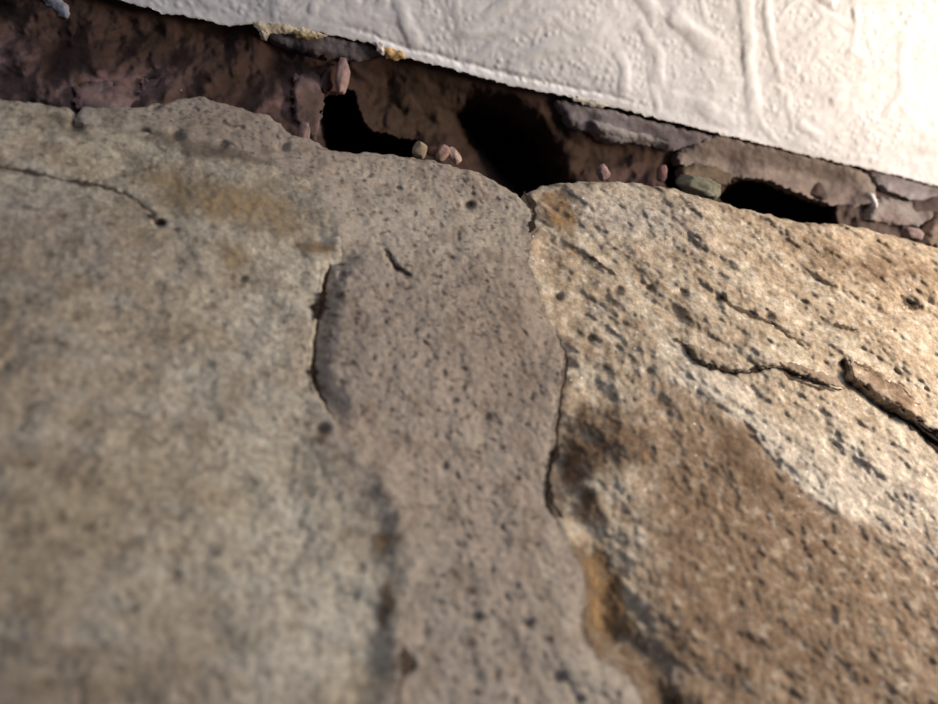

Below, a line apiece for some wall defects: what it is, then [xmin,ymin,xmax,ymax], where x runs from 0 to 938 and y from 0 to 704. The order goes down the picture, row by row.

peeling [42,0,70,19]
spalling [335,57,350,95]
peeling [589,119,668,147]
crack [0,166,166,225]
crack [524,191,537,233]
crack [586,254,616,275]
crack [306,264,335,420]
crack [718,292,806,349]
crack [834,322,858,331]
crack [901,294,921,310]
crack [673,338,938,451]
crack [545,335,568,527]